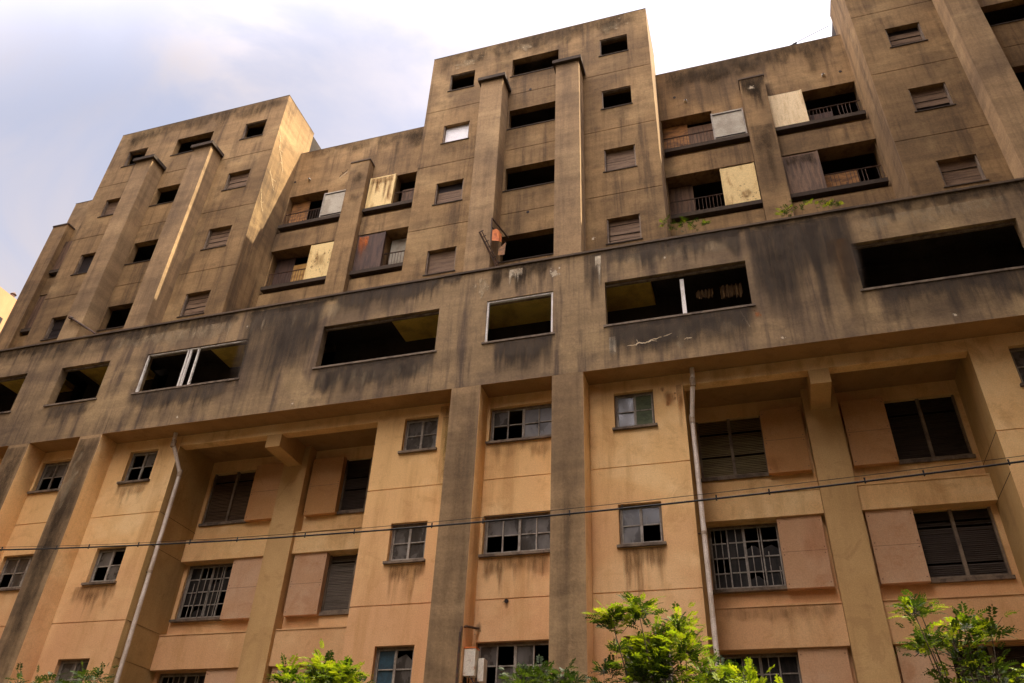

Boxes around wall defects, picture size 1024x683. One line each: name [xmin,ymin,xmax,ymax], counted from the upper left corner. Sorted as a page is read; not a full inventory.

leakage [669,38,828,95]
leakage [493,260,549,285]
leakage [590,210,852,291]
leakage [0,341,67,357]
leakage [90,313,234,342]
leakage [249,275,457,353]